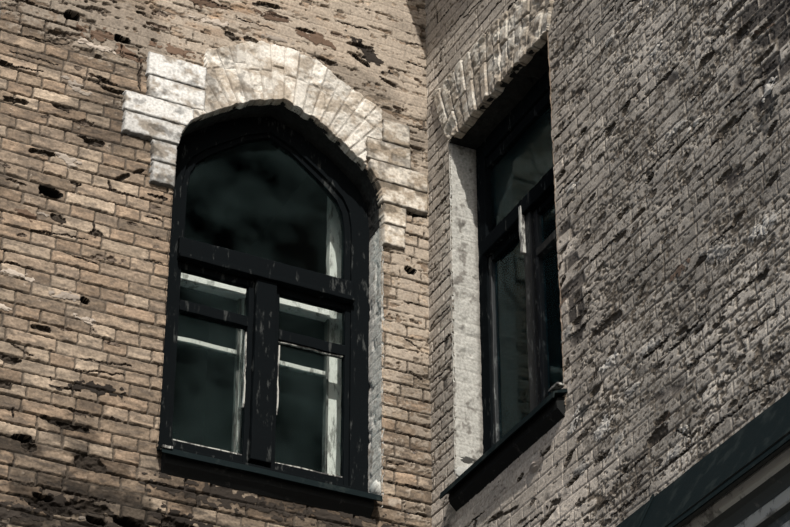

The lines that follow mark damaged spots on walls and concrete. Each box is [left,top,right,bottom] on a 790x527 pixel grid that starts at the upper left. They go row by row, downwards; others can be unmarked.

spalling [330,31,375,67]
spalling [697,50,716,72]
spalling [751,45,774,68]
spalling [74,65,124,95]
spalling [715,103,749,139]
spalling [38,185,63,199]
crack [404,275,450,353]
spalling [569,291,591,326]
spalling [10,434,37,452]
spalling [24,491,149,527]
spalling [473,498,536,527]